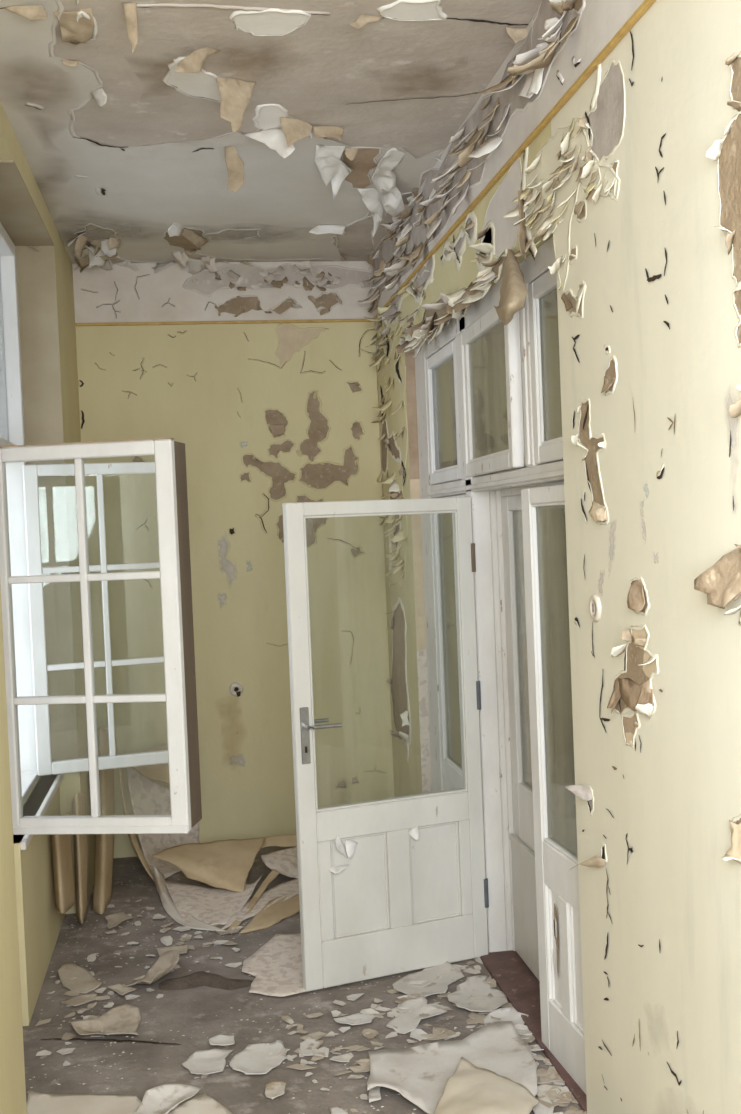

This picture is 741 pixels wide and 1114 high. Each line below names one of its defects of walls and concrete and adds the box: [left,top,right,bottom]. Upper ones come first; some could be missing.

spalling [48,0,625,543]
peeling [706,51,741,348]
peeling [306,518,328,549]
peeling [378,515,411,762]
peeling [607,580,659,753]
peeling [694,544,741,626]
peeling [722,814,741,864]